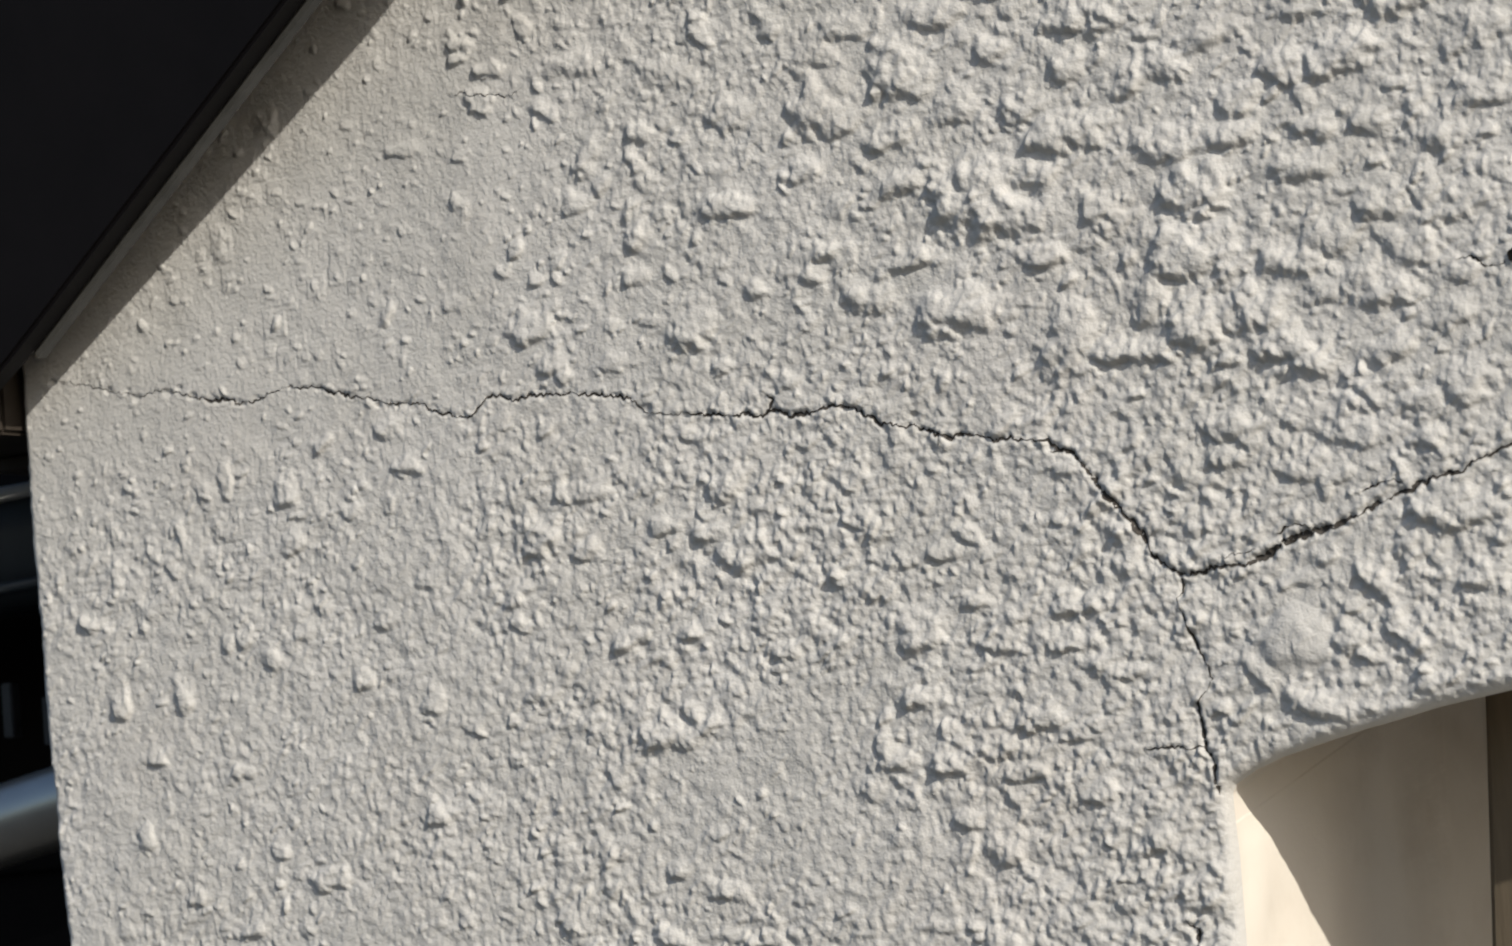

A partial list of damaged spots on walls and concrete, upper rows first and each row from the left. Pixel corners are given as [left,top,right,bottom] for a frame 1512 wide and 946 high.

crack [55,380,1512,794]